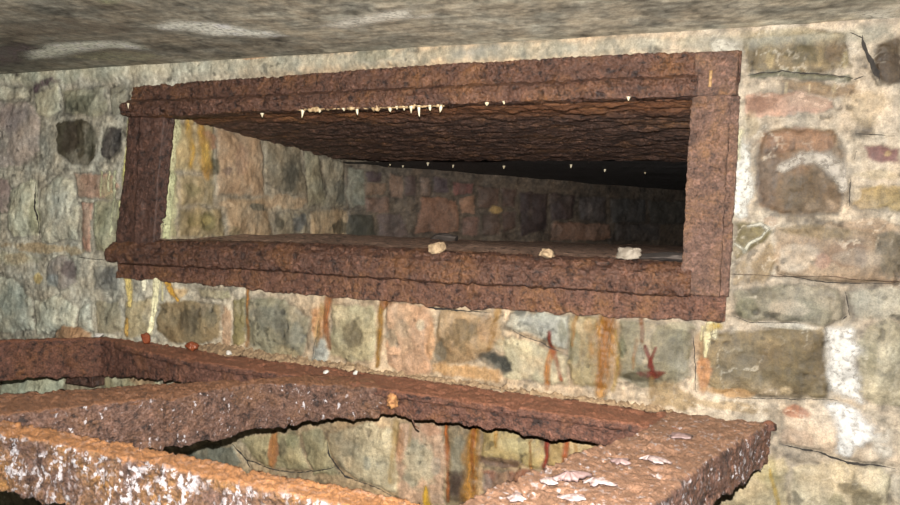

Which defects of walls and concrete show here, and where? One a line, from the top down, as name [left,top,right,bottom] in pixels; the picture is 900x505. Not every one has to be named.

crack [748,32,880,81]
rust [323,296,331,349]
rust [376,301,387,367]
rust [545,331,562,386]
rust [591,316,618,398]
rust [633,318,663,378]
water stain [826,328,893,458]
rust [463,425,479,501]
rust [506,492,526,502]
rust [529,436,618,502]
rust [610,455,672,466]